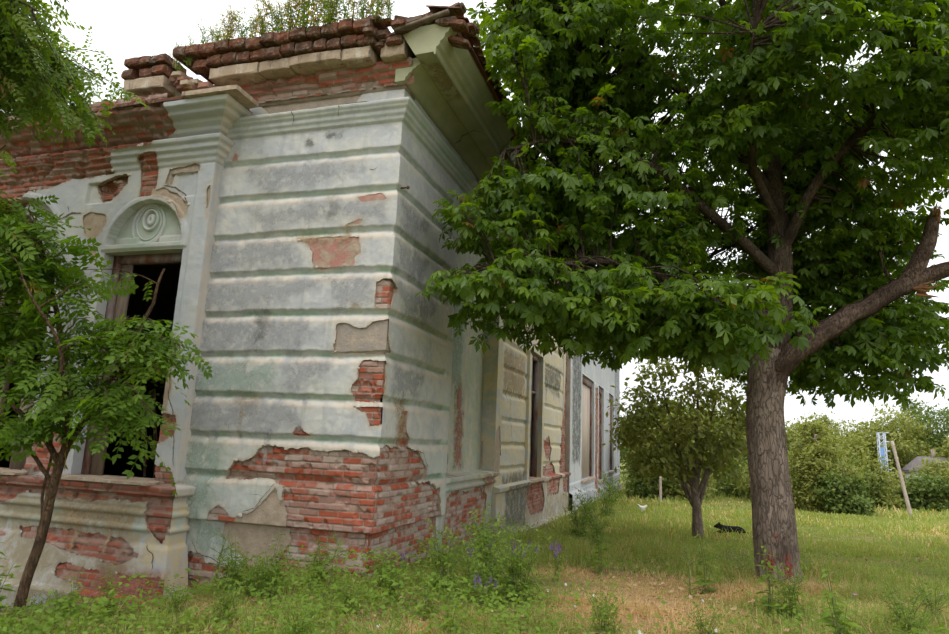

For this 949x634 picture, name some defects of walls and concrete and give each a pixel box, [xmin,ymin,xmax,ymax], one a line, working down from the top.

spalling [0,93,200,258]
peeling [298,219,364,270]
peeling [332,279,396,426]
spalling [0,432,176,543]
spalling [20,526,164,616]
spalling [188,411,486,593]